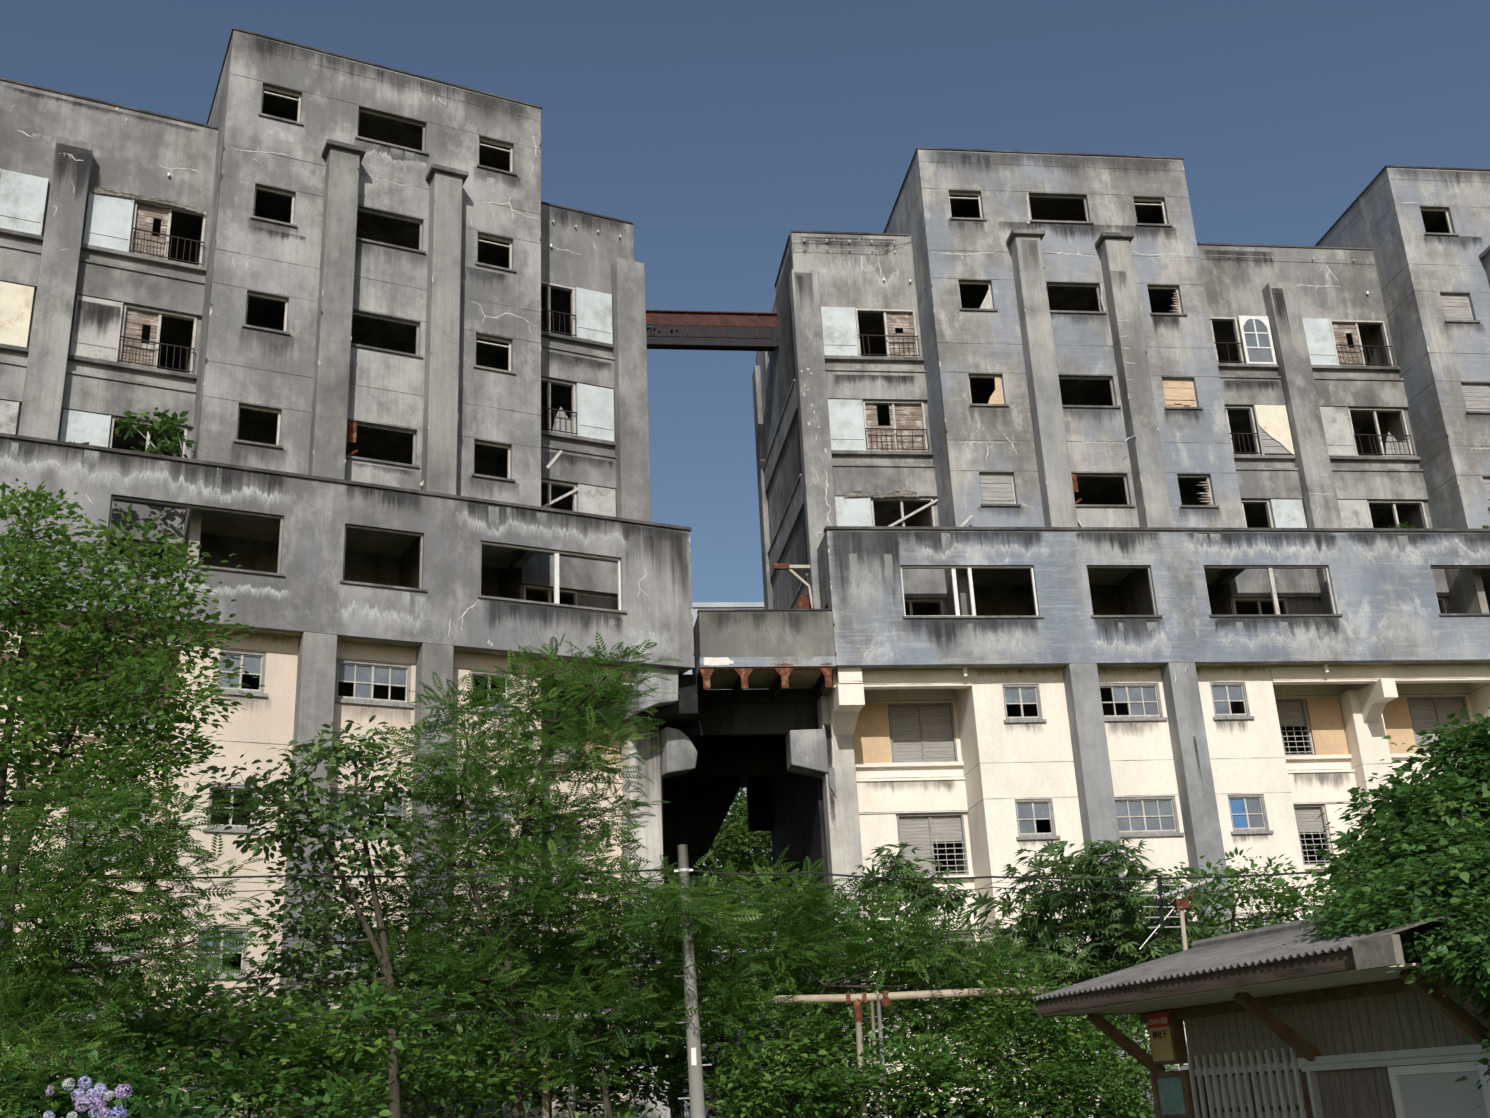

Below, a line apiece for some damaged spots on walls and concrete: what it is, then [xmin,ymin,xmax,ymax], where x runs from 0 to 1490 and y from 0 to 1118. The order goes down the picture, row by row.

crack [472,302,538,332]
leakage [0,437,283,502]
leakage [347,484,419,506]
leakage [469,501,687,582]
leakage [1076,532,1155,550]
leakage [1184,532,1490,559]
leakage [163,580,286,596]
leakage [342,600,423,627]
leakage [490,601,620,628]
leakage [1095,618,1167,654]
leakage [1216,618,1339,647]